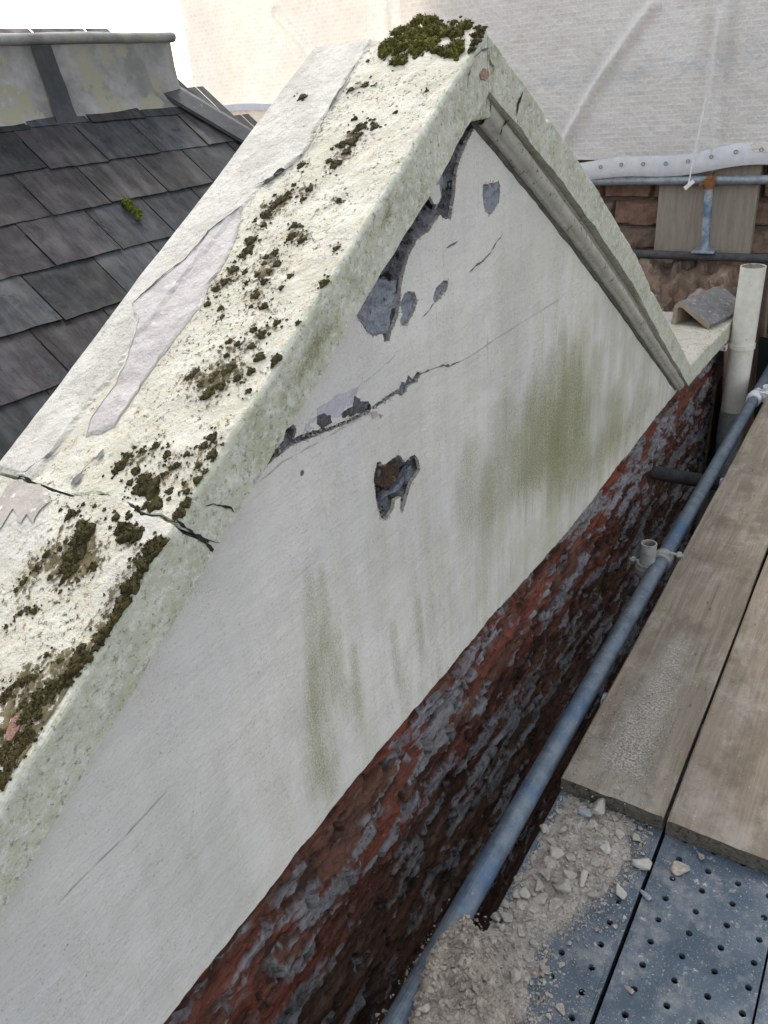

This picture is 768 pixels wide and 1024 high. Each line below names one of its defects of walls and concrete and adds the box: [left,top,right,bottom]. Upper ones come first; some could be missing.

spalling [357,122,474,344]
peeling [482,179,501,216]
peeling [85,205,242,438]
crack [263,299,560,479]
crack [15,444,105,497]
spalling [373,450,421,521]
crack [130,504,214,552]